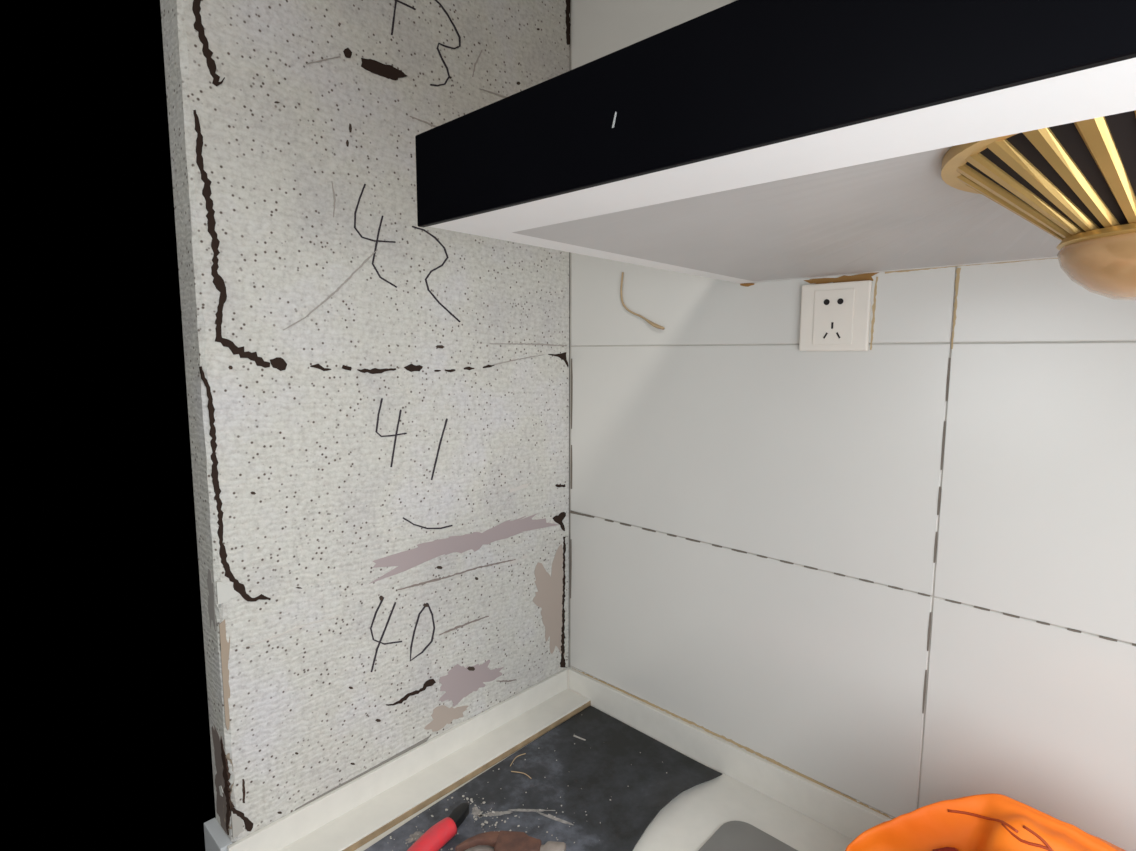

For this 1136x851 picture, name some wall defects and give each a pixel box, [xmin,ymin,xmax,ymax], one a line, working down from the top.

crack [192,0,225,86]
crack [564,0,572,45]
crack [193,110,270,368]
crack [329,181,337,217]
crack [283,249,378,330]
crack [310,364,396,374]
crack [199,366,271,602]
crack [386,679,436,706]
spalling [211,724,244,840]